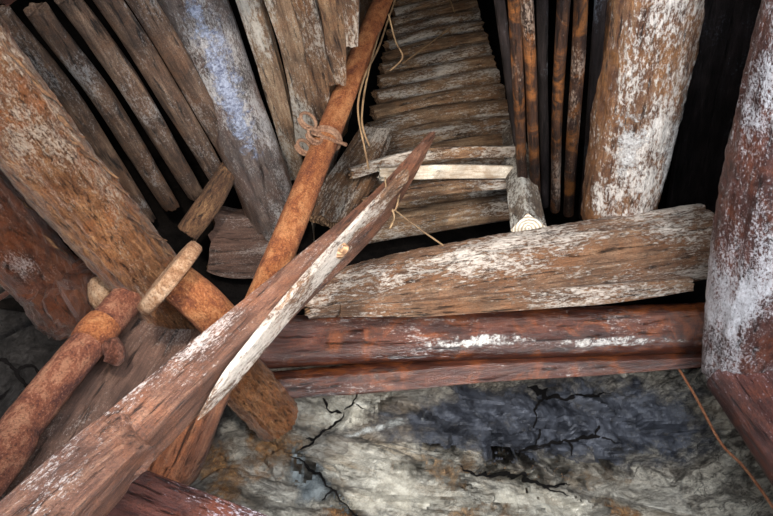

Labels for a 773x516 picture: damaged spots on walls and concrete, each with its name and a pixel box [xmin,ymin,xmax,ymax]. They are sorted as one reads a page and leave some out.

crack [0,358,39,399]
crack [514,385,616,456]
crack [460,466,573,496]